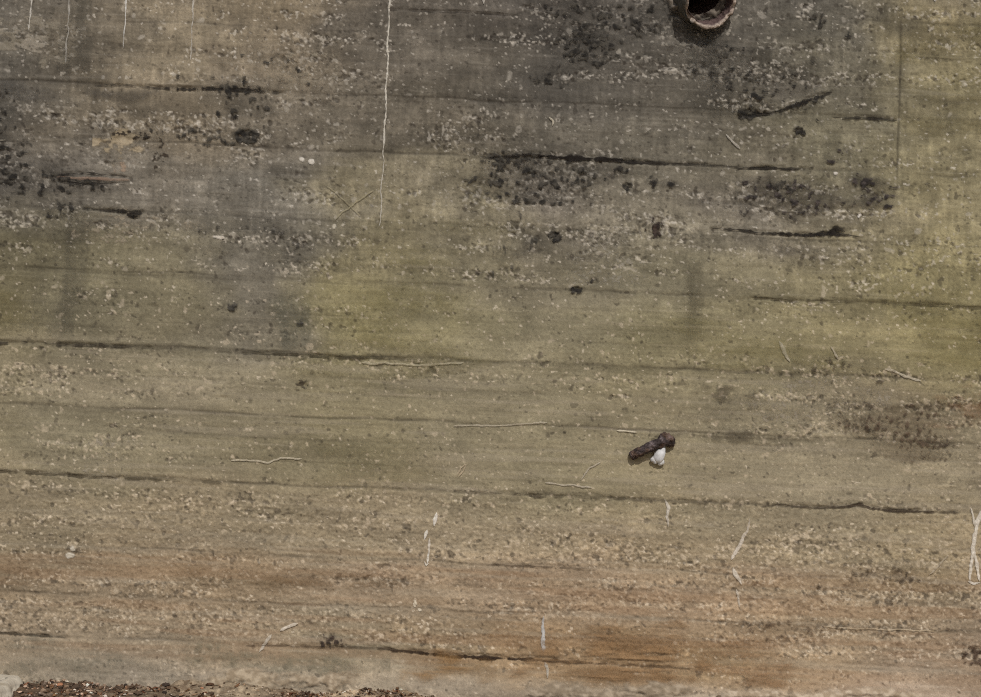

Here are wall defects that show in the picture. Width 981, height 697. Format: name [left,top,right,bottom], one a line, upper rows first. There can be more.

corrosion [629,432,675,466]